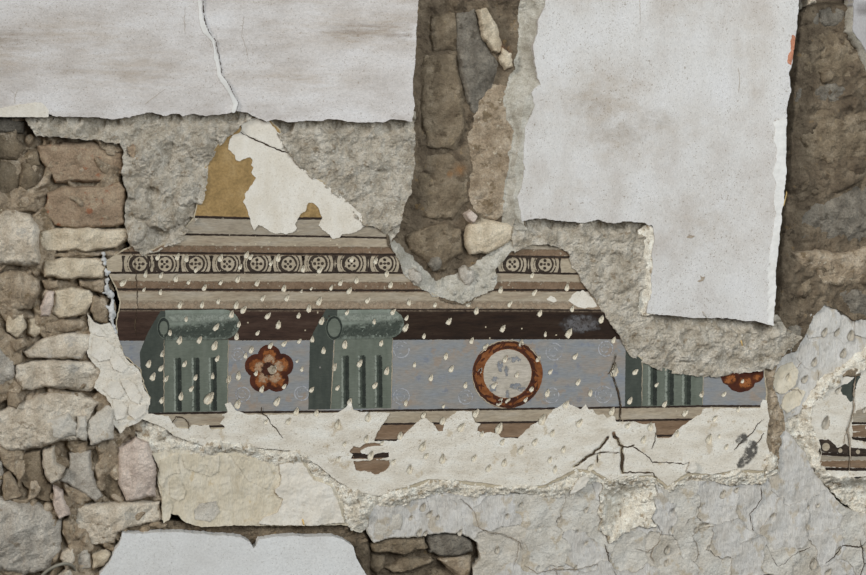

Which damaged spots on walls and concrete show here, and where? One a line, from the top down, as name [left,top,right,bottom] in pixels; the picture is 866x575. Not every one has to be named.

spalling [844,0,866,70]
crack [184,0,288,153]
spalling [0,117,866,575]
crack [574,357,689,476]
crack [734,419,764,450]
crack [843,377,856,471]
crack [463,501,616,575]
crack [750,489,810,565]
crack [826,540,866,575]